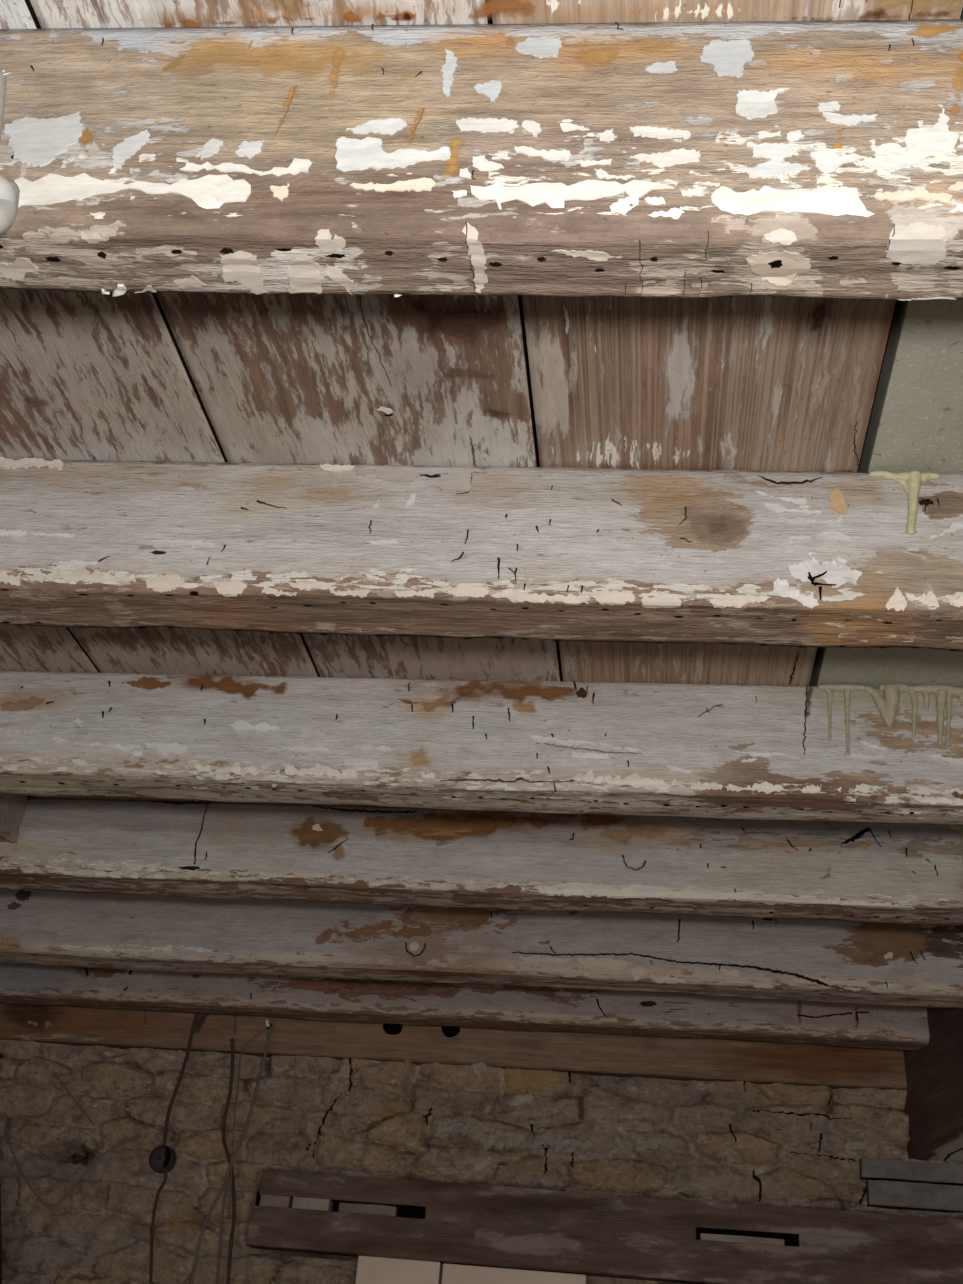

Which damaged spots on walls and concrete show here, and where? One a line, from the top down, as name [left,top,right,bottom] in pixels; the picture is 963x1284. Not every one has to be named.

peeling [700,39,789,120]
peeling [3,112,312,209]
peeling [335,101,963,293]
peeling [285,229,357,295]
peeling [210,580,370,598]
peeling [395,587,681,609]
spalling [710,489,862,609]
crack [152,801,212,864]
crack [312,805,417,813]
peeling [531,735,878,802]
crack [512,918,888,1022]
crack [305,1058,353,1158]